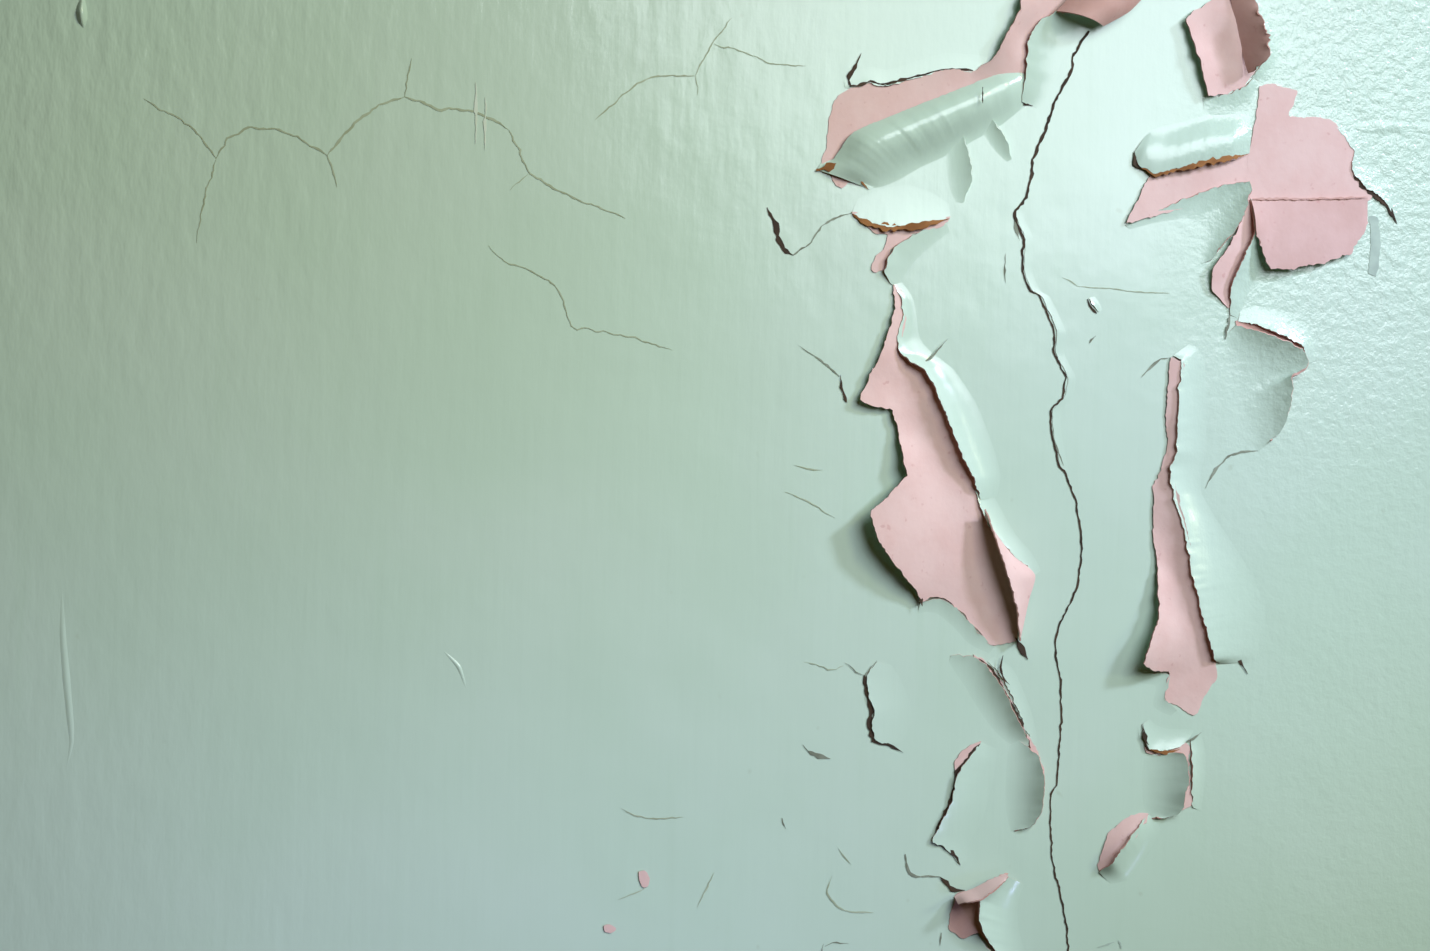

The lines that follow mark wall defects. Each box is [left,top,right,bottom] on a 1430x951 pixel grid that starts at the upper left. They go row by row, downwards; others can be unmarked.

crack [146,59,624,243]
crack [595,20,802,120]
crack [489,246,669,349]
peeling [767,0,1141,865]
crack [1004,31,1164,951]
peeling [1097,0,1404,884]
peeling [905,854,1025,951]